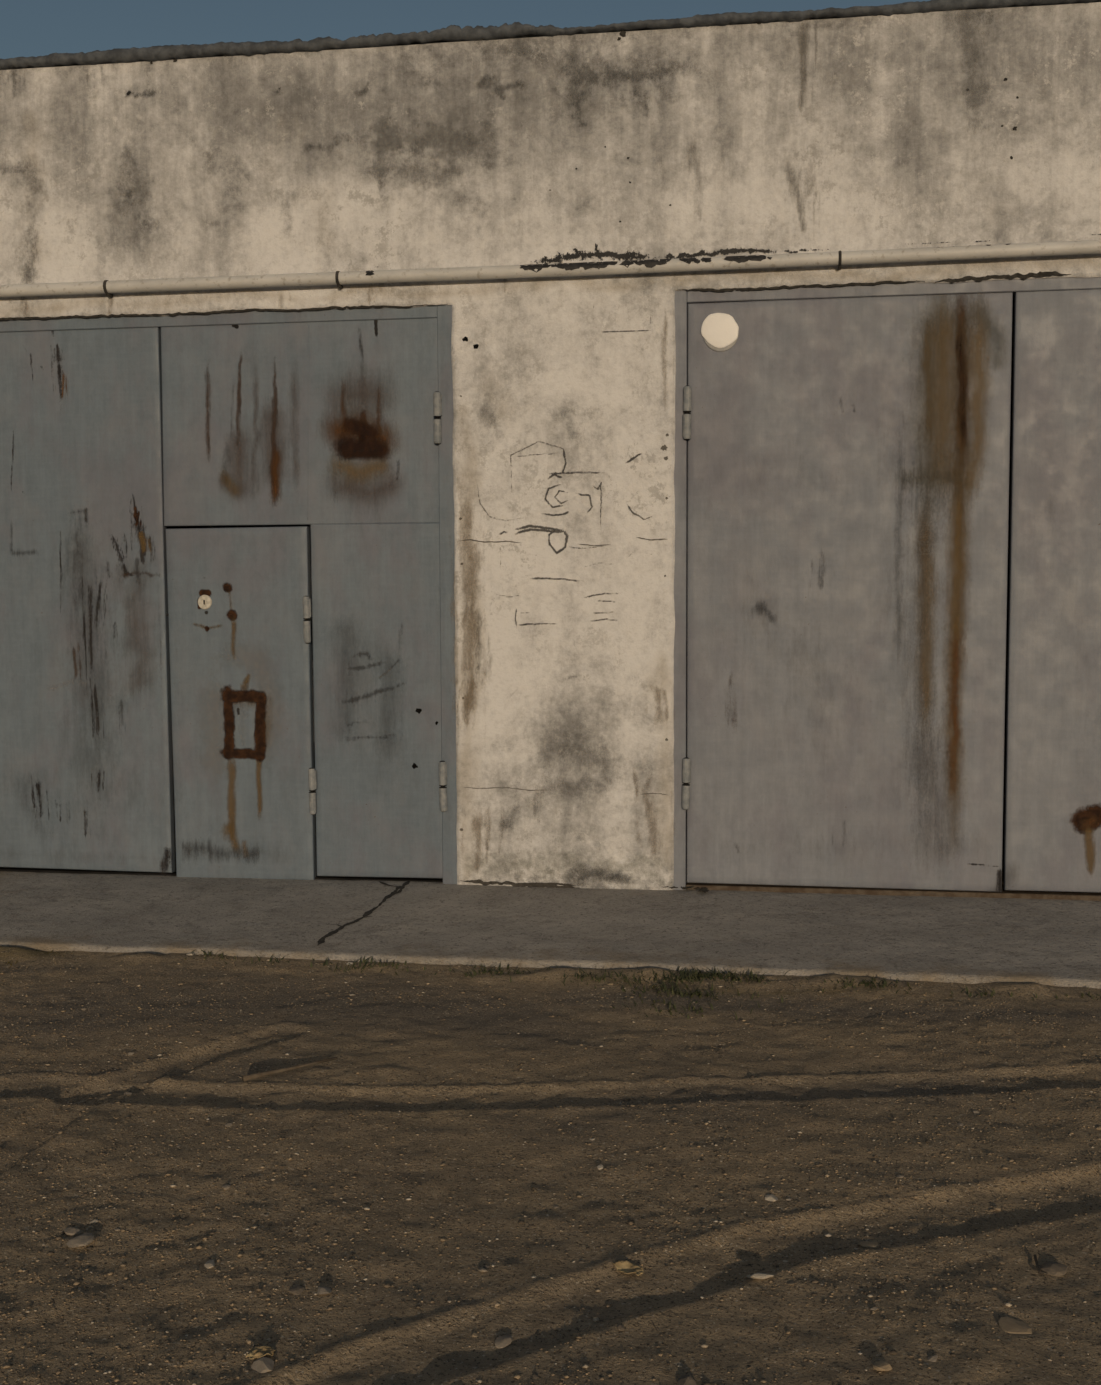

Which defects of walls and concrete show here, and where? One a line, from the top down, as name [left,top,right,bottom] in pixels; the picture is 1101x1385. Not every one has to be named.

corrosion [224,358,243,493]
corrosion [270,371,280,501]
corrosion [328,384,399,496]
corrosion [919,517,933,712]
corrosion [924,309,986,803]
corrosion [220,675,267,853]
corrosion [1072,805,1101,873]
crack [318,881,410,945]